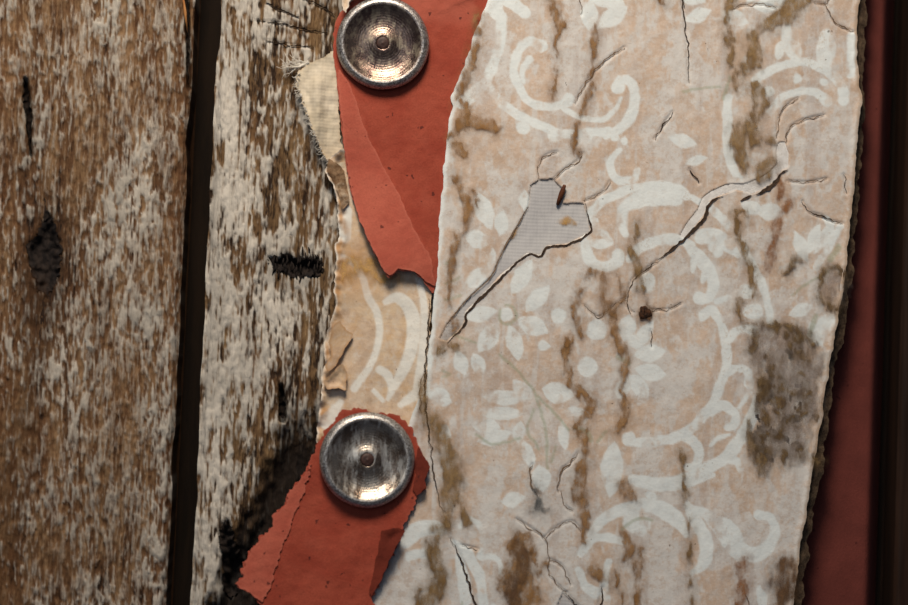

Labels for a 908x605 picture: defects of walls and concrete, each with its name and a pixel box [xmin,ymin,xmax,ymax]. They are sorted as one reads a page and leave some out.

crack [575,48,625,102]
crack [682,0,690,80]
crack [776,99,822,141]
crack [537,152,583,179]
crack [789,174,847,224]
peeling [440,179,593,341]
leakage [734,209,757,298]
peeling [324,321,353,391]
crack [419,300,446,513]
leakage [736,300,824,475]
crack [517,453,581,605]
crack [450,538,477,605]